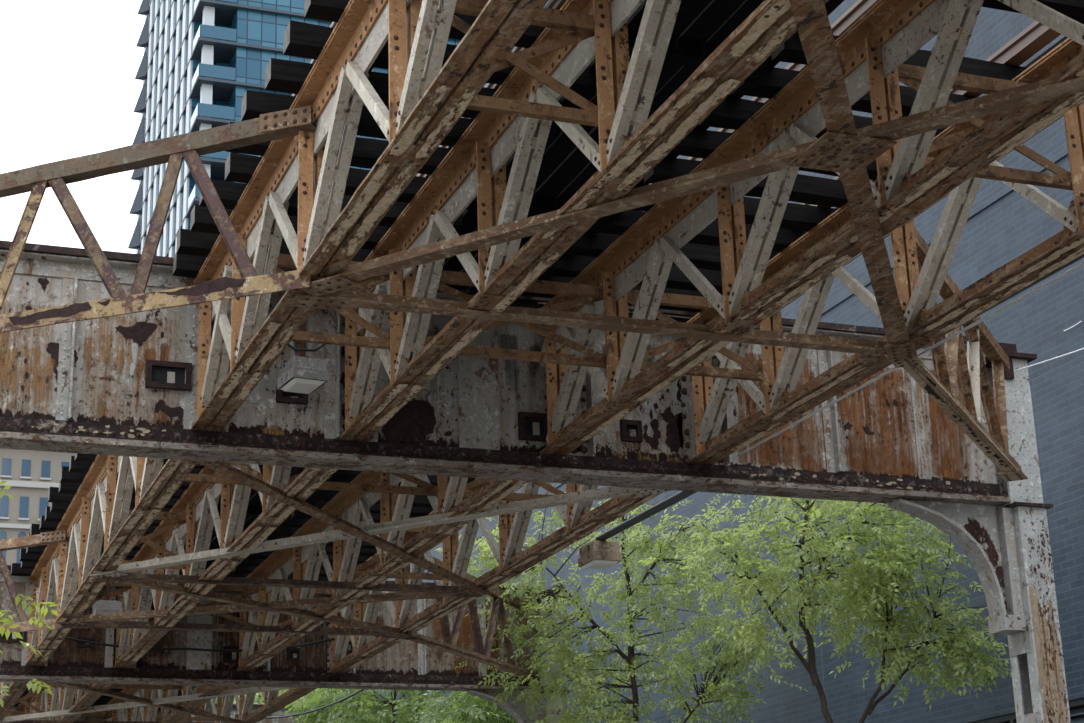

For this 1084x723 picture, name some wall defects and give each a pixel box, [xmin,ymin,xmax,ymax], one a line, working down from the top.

peeling [987,92,1084,159]
peeling [879,166,959,223]
peeling [158,277,246,296]
peeling [737,235,858,320]
corrosion [0,327,54,413]
peeling [0,277,184,438]
corrosion [85,316,176,425]
peeling [570,329,738,463]
corrosion [737,353,764,421]
corrosion [738,405,825,472]
corrosion [837,367,969,479]
corrosion [1030,587,1067,723]